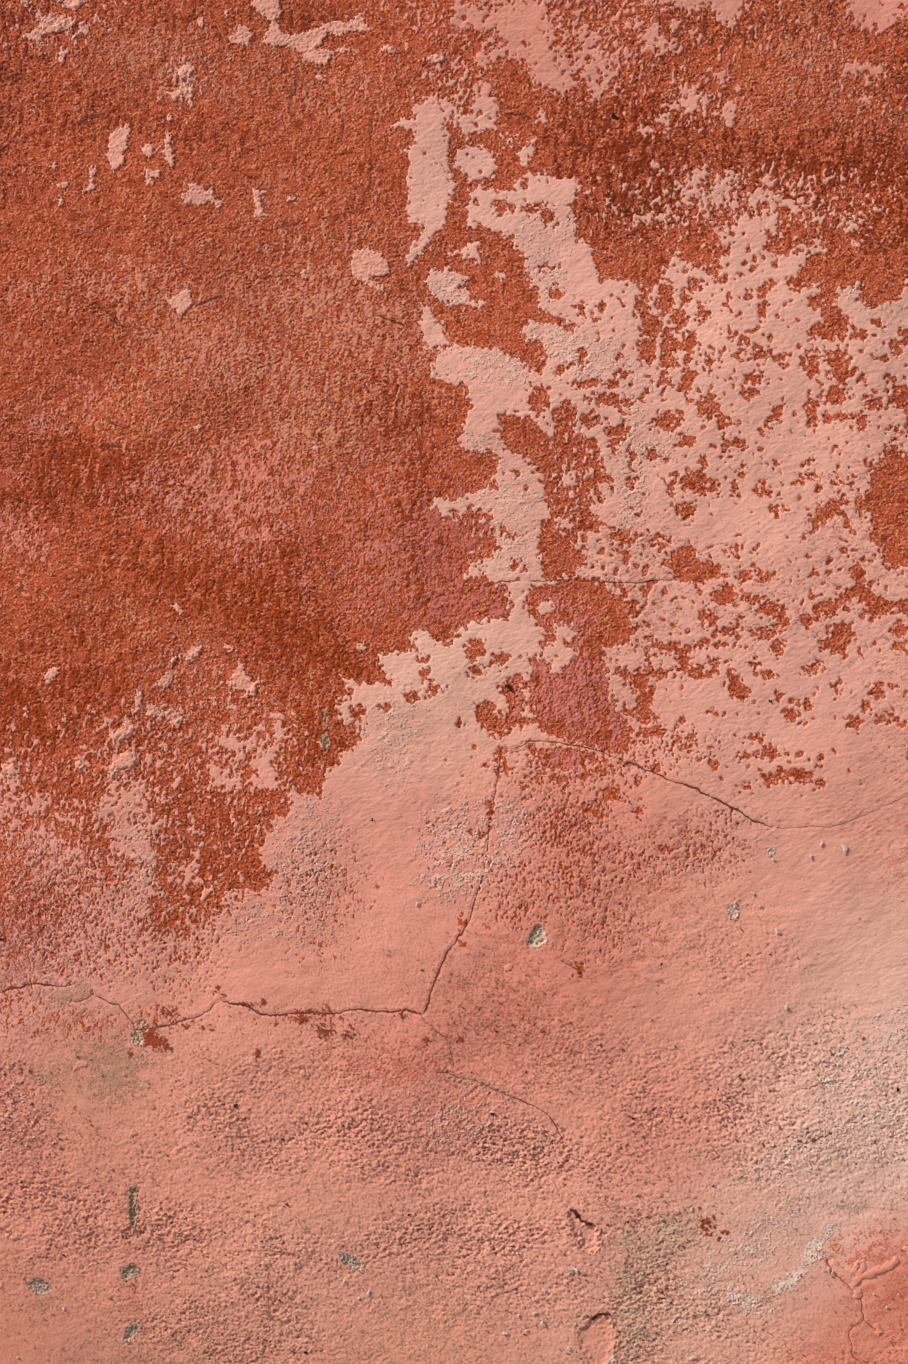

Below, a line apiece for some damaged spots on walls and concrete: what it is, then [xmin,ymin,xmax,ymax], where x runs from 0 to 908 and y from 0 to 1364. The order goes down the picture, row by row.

peeling [200,992,436,1069]
crack [0,740,907,1136]
spalling [420,954,546,1046]
spalling [281,1069,380,1213]
spalling [405,1026,744,1364]
spalling [656,1076,906,1202]